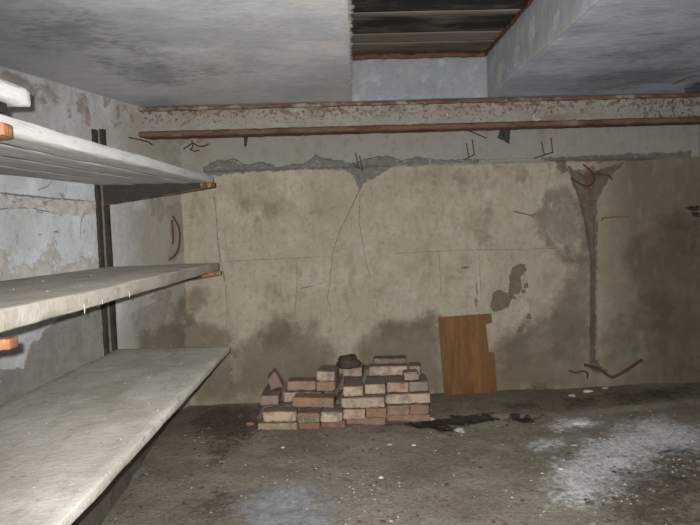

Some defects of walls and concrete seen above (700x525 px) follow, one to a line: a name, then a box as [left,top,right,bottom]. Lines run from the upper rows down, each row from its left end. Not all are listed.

spalling [203,139,479,188]
spalling [568,163,643,379]
peeling [0,307,103,406]